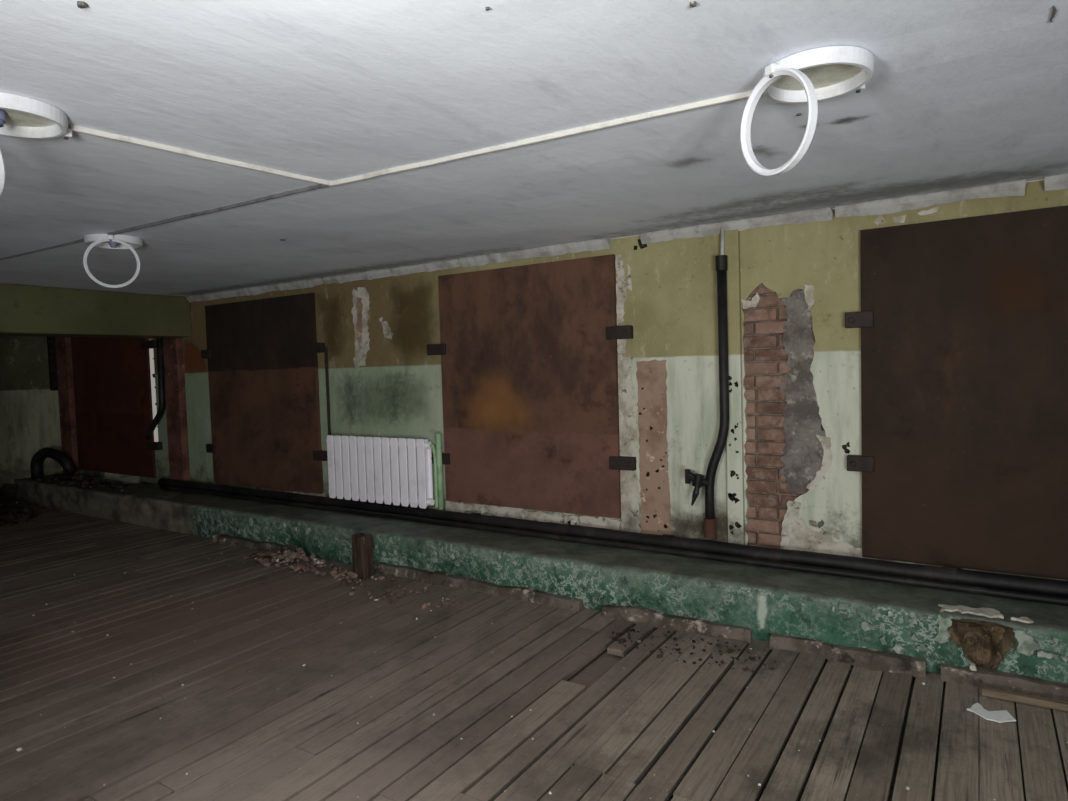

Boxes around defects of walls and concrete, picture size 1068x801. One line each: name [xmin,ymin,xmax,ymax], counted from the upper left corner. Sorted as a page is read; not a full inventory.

spalling [728,283,863,558]
spalling [861,604,1068,671]